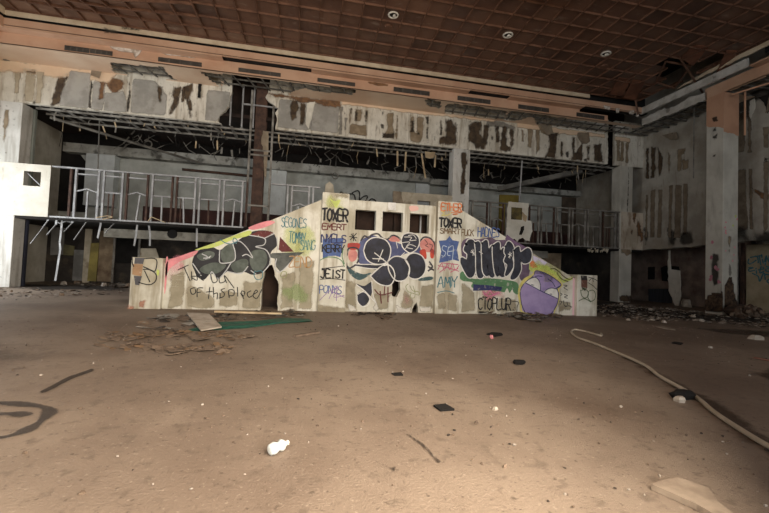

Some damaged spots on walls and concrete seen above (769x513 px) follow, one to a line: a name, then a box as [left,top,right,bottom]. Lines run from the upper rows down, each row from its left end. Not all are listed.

peeling [14,71,44,103]
peeling [60,70,167,115]
peeling [198,77,230,121]
peeling [278,99,339,133]
peeling [738,93,769,153]
peeling [645,184,688,238]
peeling [738,169,753,230]
spalling [705,277,738,312]